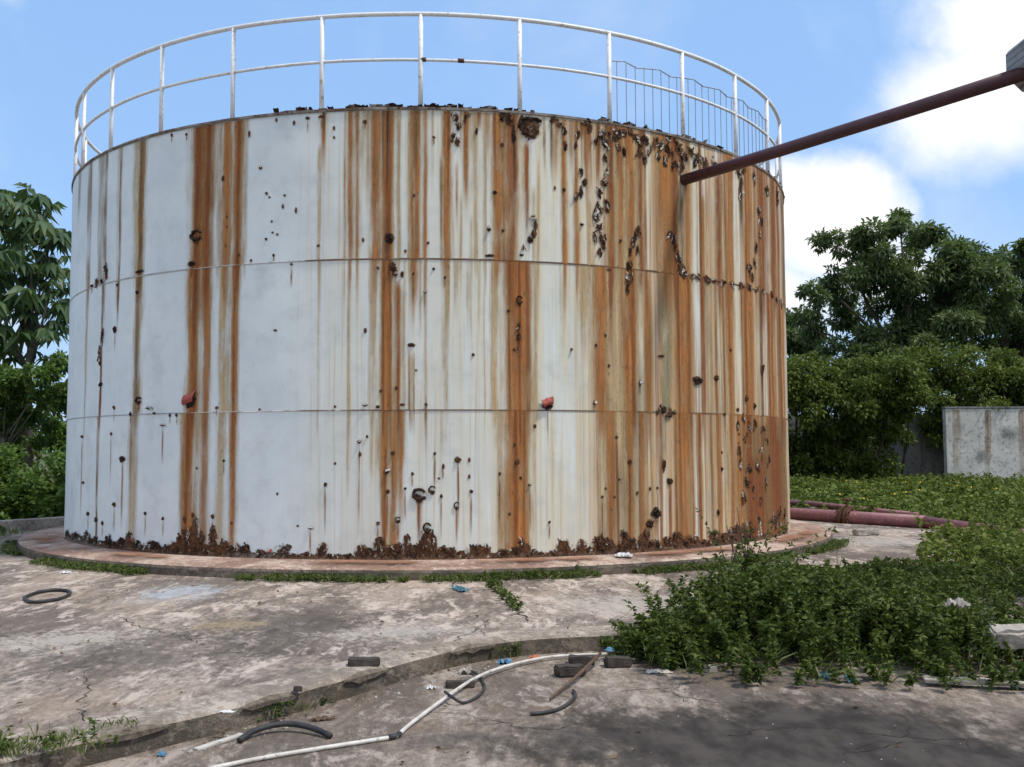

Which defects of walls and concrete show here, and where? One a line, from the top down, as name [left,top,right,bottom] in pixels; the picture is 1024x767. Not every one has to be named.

rust [33,110,818,563]
crack [68,672,92,724]